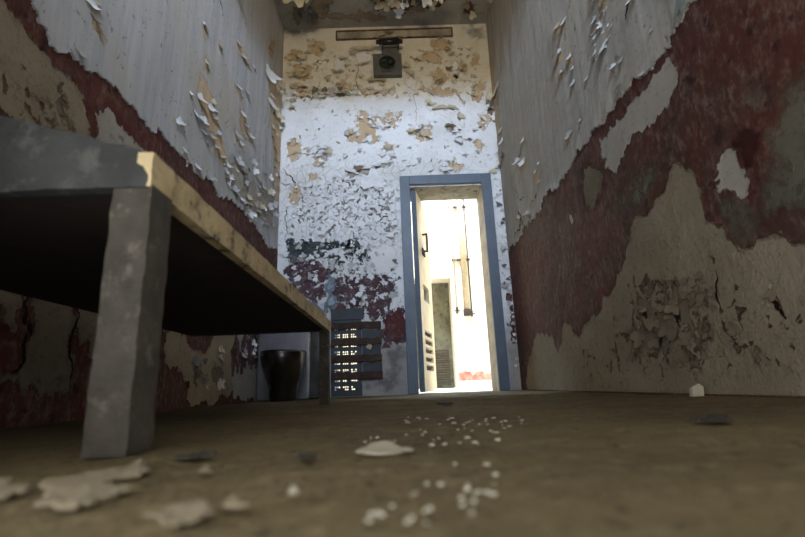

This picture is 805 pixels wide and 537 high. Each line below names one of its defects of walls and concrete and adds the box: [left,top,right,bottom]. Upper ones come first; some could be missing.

peeling [0,0,805,407]